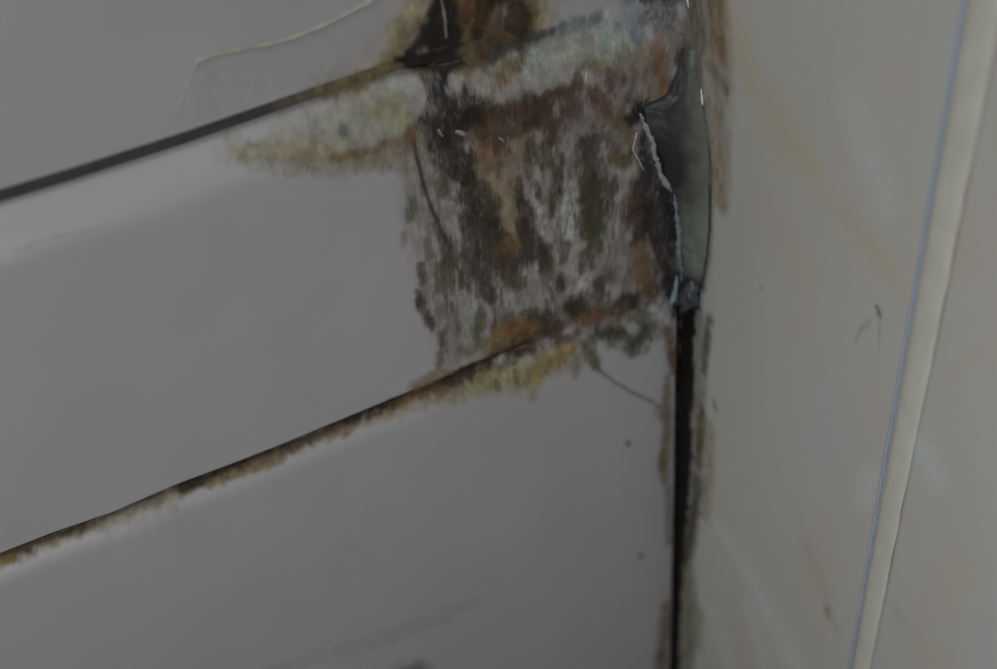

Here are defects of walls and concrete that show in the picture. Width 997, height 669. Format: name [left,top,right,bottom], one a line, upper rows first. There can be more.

water stain [239,0,679,399]
corrosion [0,318,545,566]
water stain [678,310,716,669]